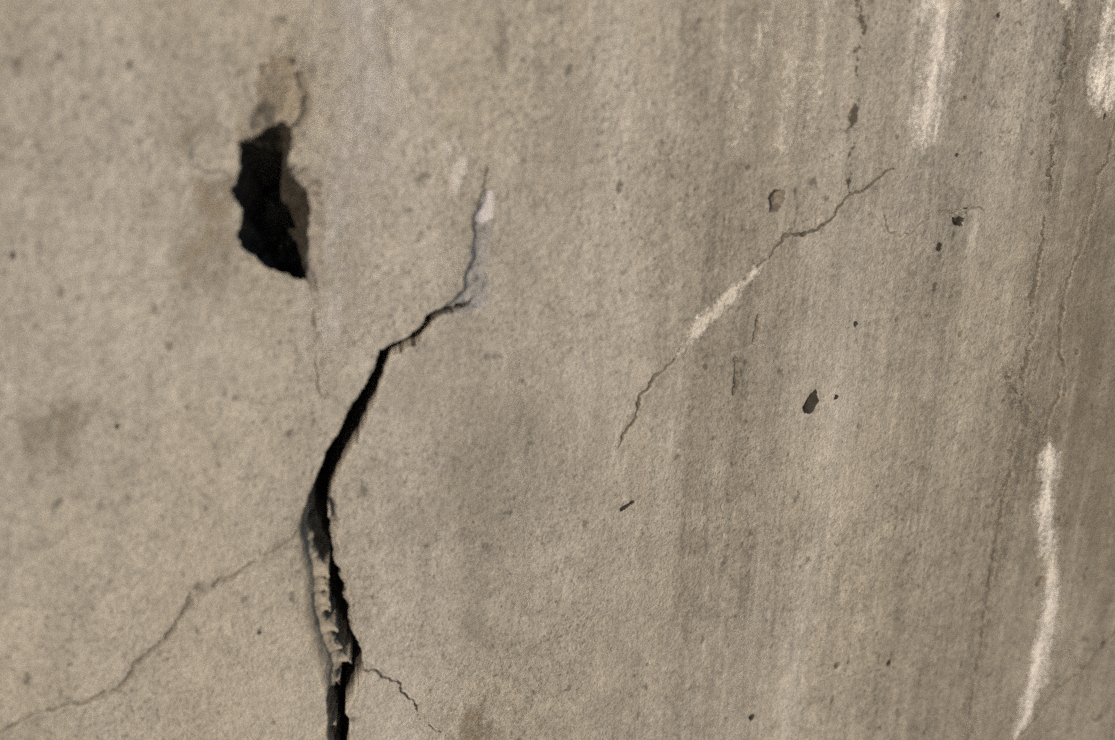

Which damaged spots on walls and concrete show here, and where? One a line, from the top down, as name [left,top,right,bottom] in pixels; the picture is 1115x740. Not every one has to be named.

crack [0,156,497,740]
hole [181,42,330,400]
leakage [729,0,834,160]
crack [615,165,989,451]
leakage [907,0,960,154]
efflorescence [1014,439,1061,739]
crack [999,0,1115,447]
crack [1015,631,1115,740]
leakage [1059,0,1076,28]
leakage [1087,0,1115,114]